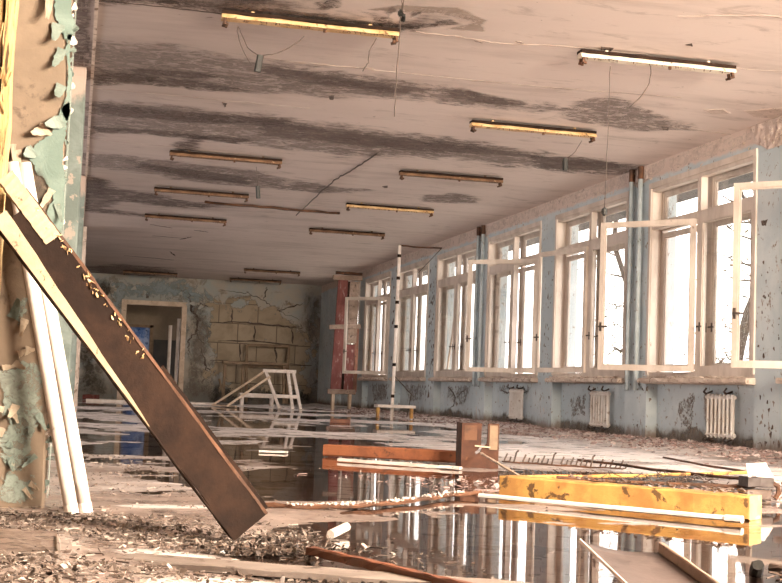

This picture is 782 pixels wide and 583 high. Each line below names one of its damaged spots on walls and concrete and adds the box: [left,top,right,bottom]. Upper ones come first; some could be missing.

peeling [10,0,79,236]
leakage [84,101,638,175]
leakage [71,0,691,131]
crack [175,287,215,384]
flaking render [107,277,318,397]
crack [223,287,303,320]